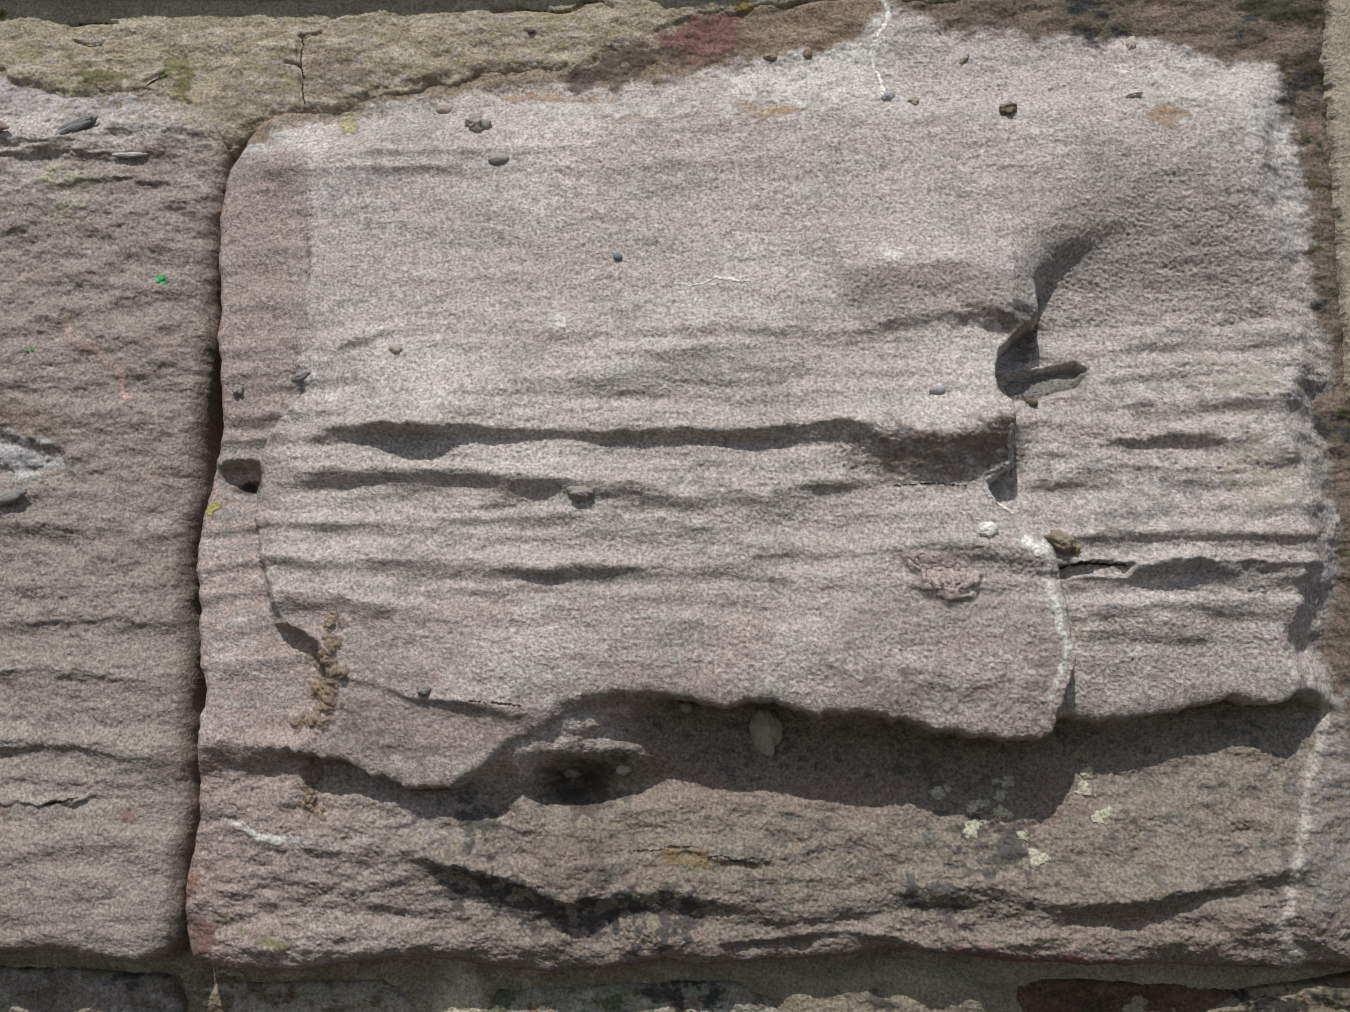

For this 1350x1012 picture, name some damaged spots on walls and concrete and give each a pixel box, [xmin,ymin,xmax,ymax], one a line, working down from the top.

spalling [544,744,625,816]